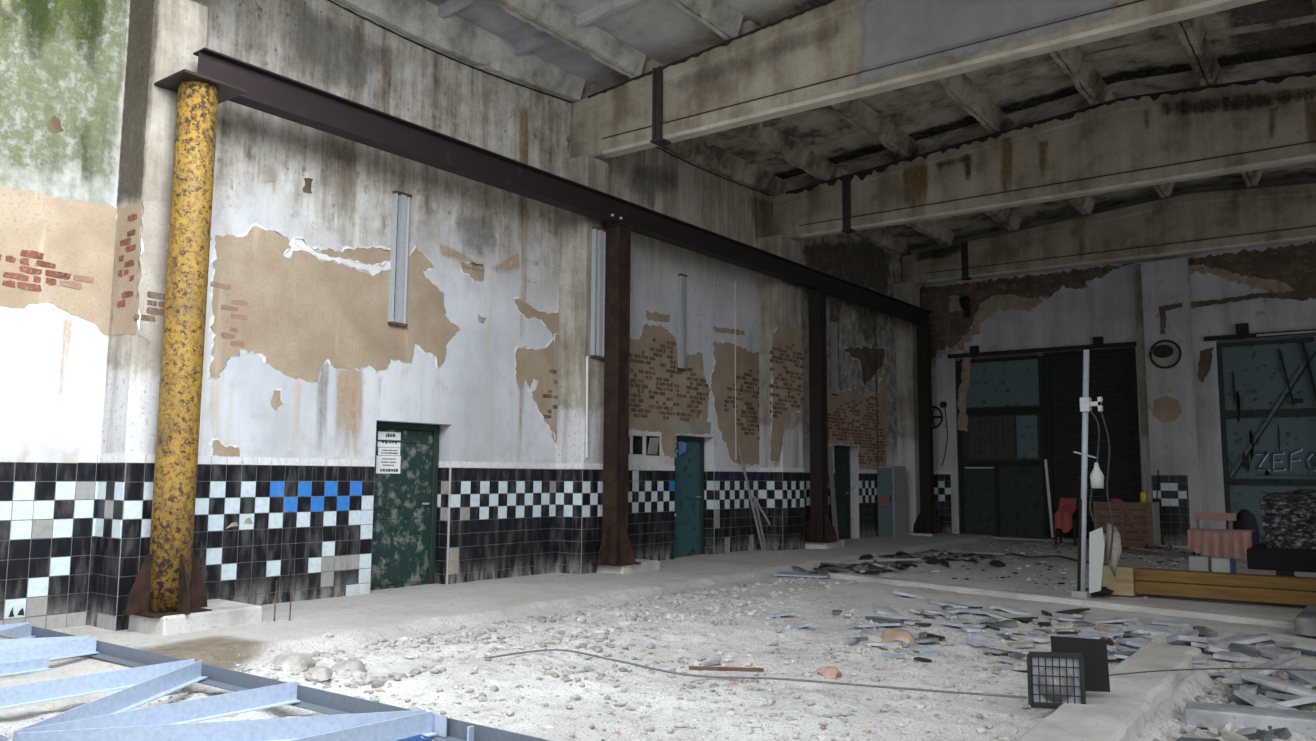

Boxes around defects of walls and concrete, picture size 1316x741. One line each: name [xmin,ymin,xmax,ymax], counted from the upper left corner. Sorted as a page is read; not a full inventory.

peeling [0,185,171,359]
peeling [207,223,460,411]
peeling [629,310,804,466]
peeling [827,346,888,470]
flaking render [920,263,1134,431]
spalling [1197,347,1214,383]
flaking render [1188,241,1316,300]